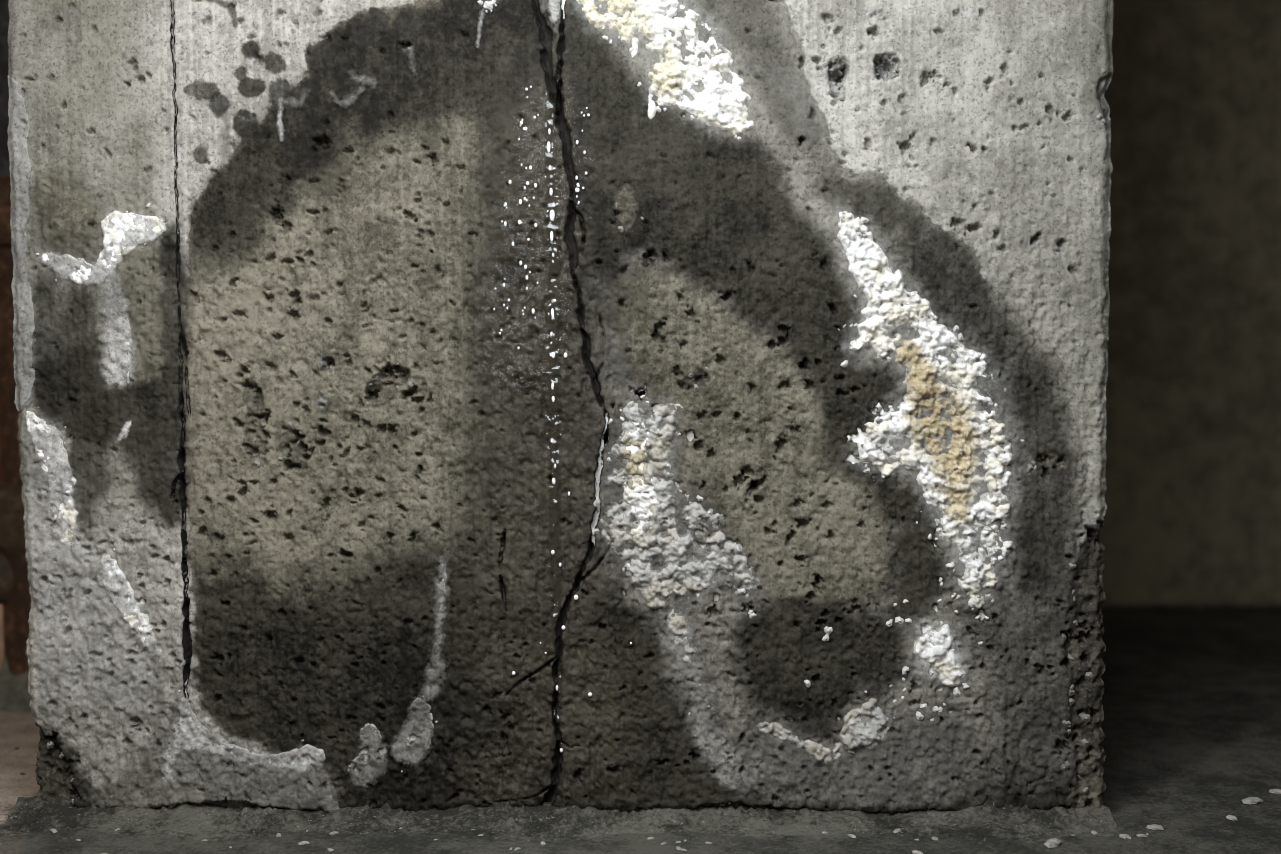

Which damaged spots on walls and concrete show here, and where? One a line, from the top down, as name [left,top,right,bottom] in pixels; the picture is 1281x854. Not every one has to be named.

crack [498,528,506,612]
leakage [26,0,1085,814]
crack [500,0,613,806]
leakage [0,604,1281,854]